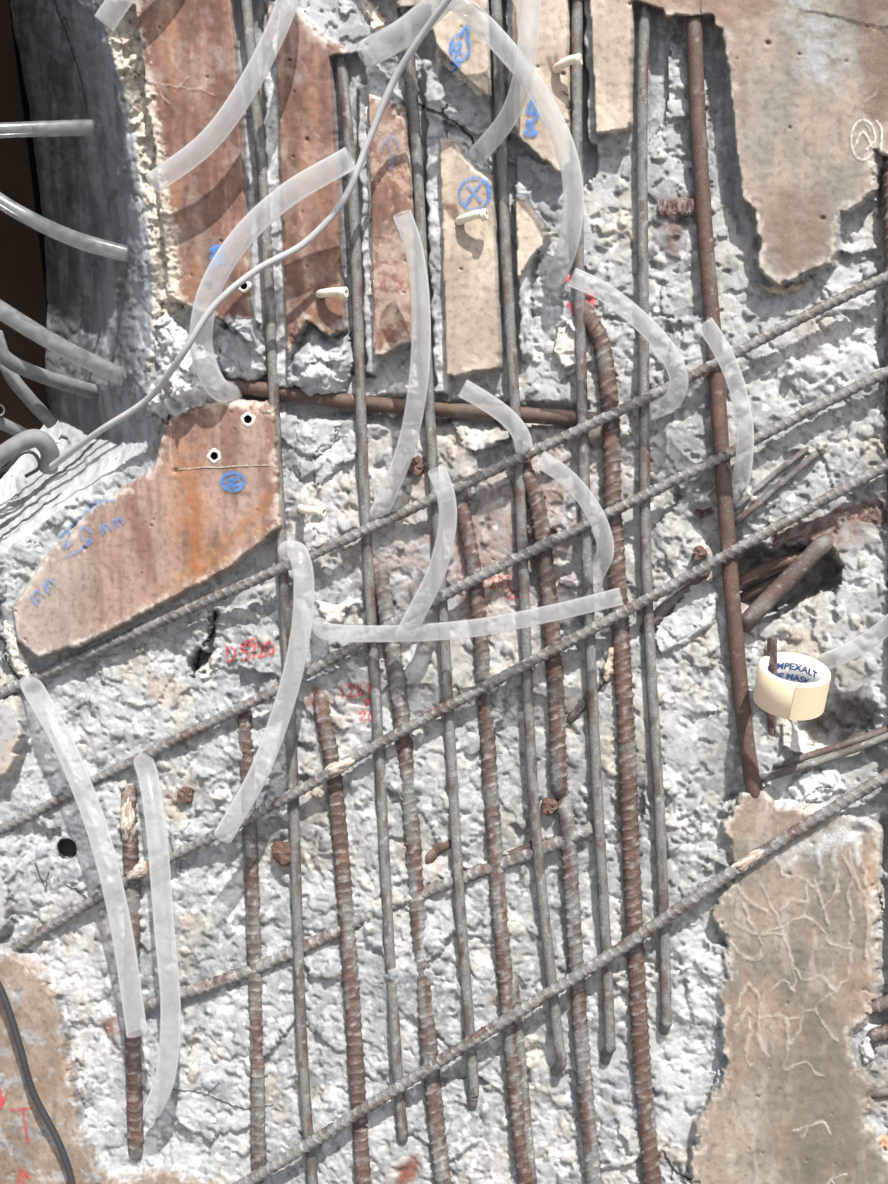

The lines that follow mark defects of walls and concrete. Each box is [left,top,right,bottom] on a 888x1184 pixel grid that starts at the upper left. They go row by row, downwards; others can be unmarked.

rust [400,1158,418,1184]
spalling [0,0,888,824]
spalling [0,366,888,1184]
crack [805,9,888,34]